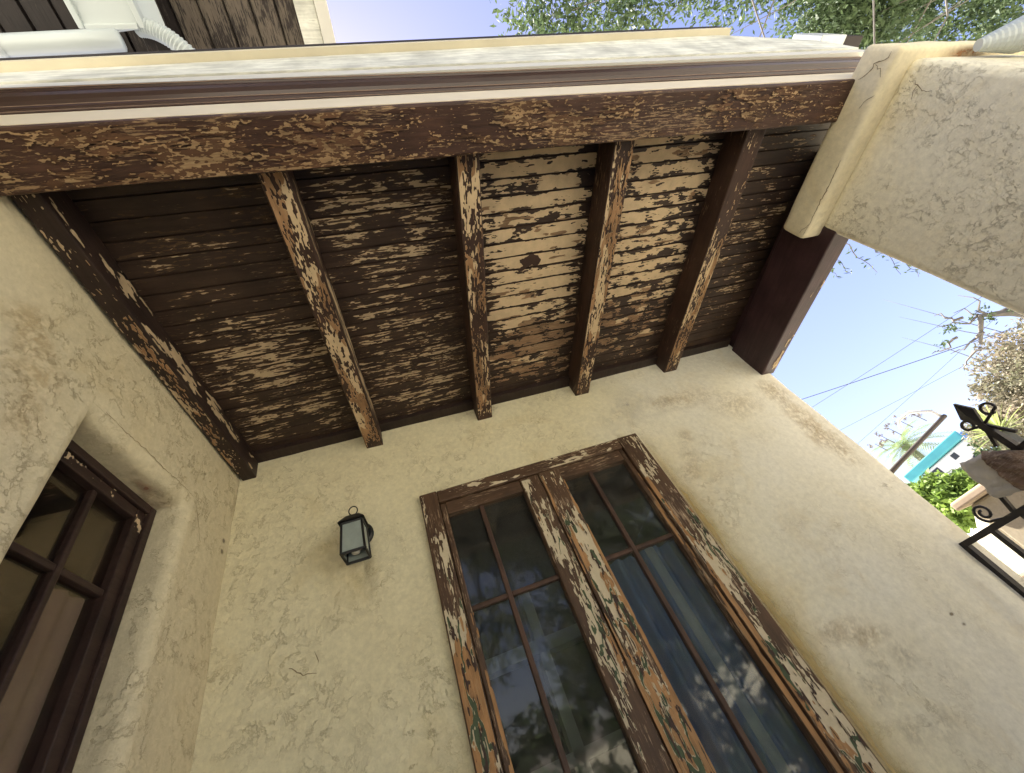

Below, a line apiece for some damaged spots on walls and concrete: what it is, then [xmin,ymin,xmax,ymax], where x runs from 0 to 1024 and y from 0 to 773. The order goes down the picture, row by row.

crack [858,51,892,107]
peeling [0,84,850,474]
peeling [421,497,514,773]
peeling [467,436,886,773]